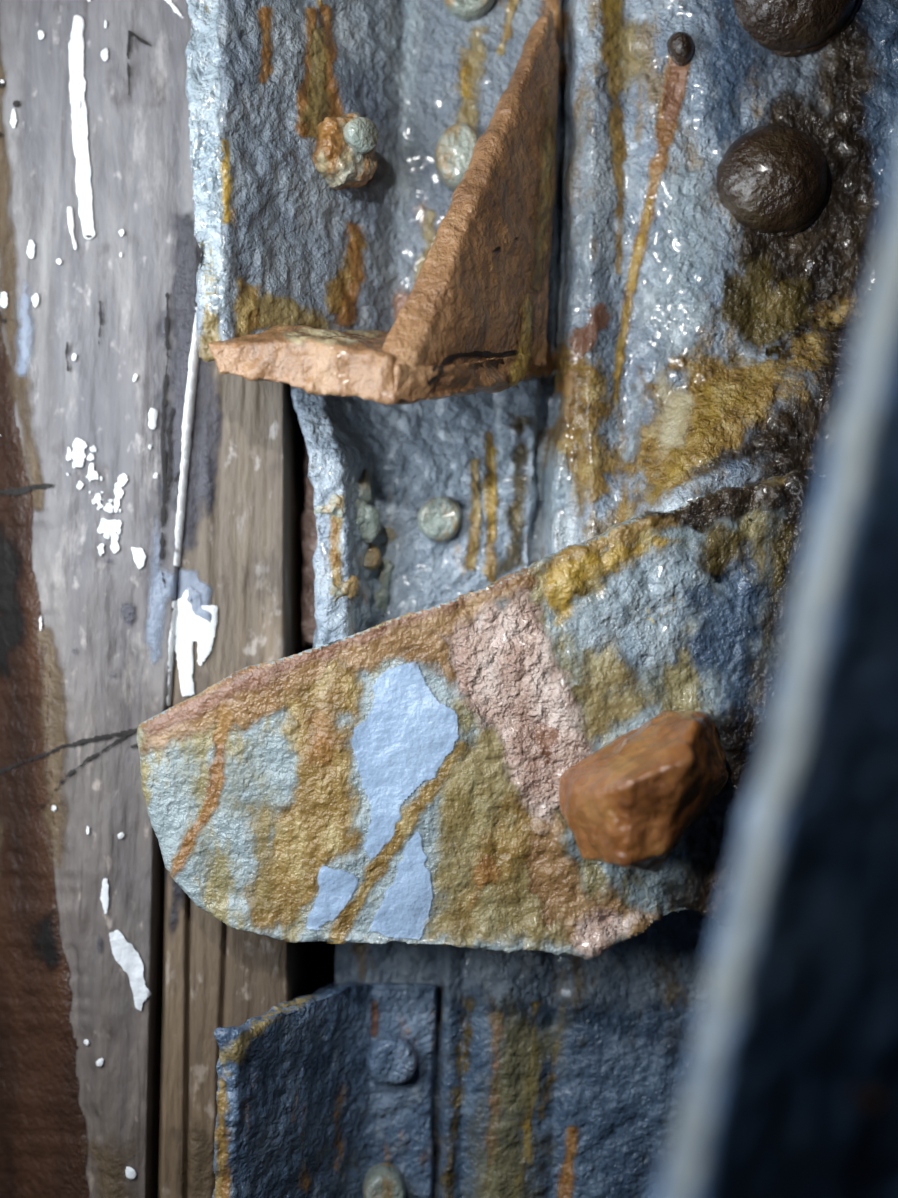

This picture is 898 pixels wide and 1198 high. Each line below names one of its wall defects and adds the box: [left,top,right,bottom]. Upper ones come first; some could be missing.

corrosion [140,0,888,960]
corrosion [180,995,313,1198]
corrosion [450,998,473,1138]
corrosion [477,1002,561,1198]
corrosion [557,1127,577,1198]